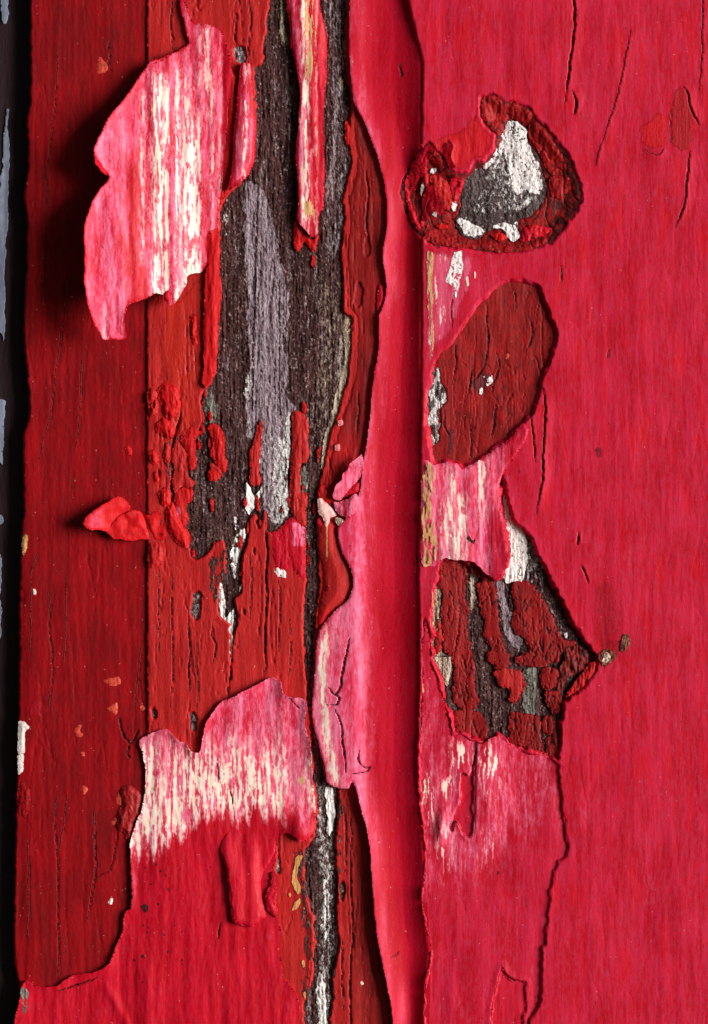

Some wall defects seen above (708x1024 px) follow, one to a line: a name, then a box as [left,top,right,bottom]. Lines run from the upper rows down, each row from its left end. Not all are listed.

crack [565,0,577,115]
crack [596,29,632,165]
crack [645,0,704,227]
spalling [400,94,582,298]
peeling [14,0,364,1024]
spalling [471,372,490,392]
crack [531,383,546,515]
crack [326,638,371,774]
peeling [420,423,597,1024]